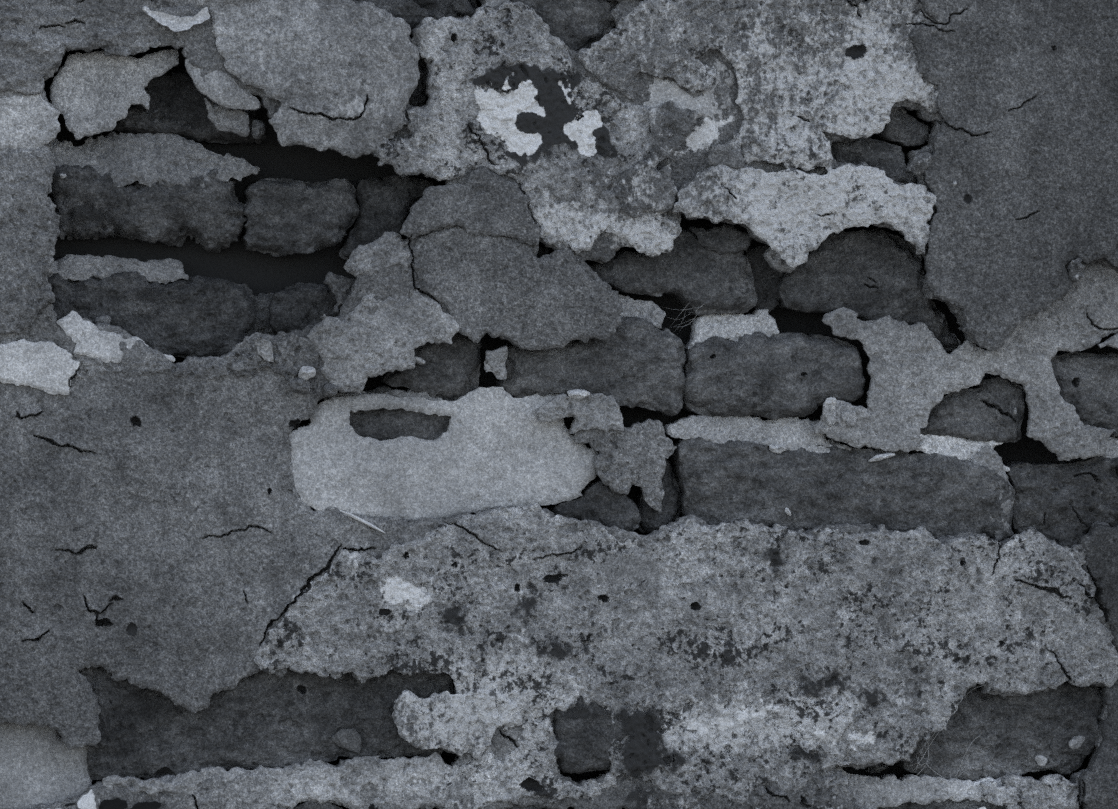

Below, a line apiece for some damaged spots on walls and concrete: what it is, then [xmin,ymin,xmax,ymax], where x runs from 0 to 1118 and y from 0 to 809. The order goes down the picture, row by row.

crack [910,8,968,32]
spalling [0,0,1118,548]
crack [16,411,91,452]
crack [57,545,97,554]
crack [84,595,122,626]
crack [260,545,370,646]
spalling [0,666,517,809]
spalling [552,696,627,774]
spalling [833,681,1104,809]
spalling [506,777,544,809]